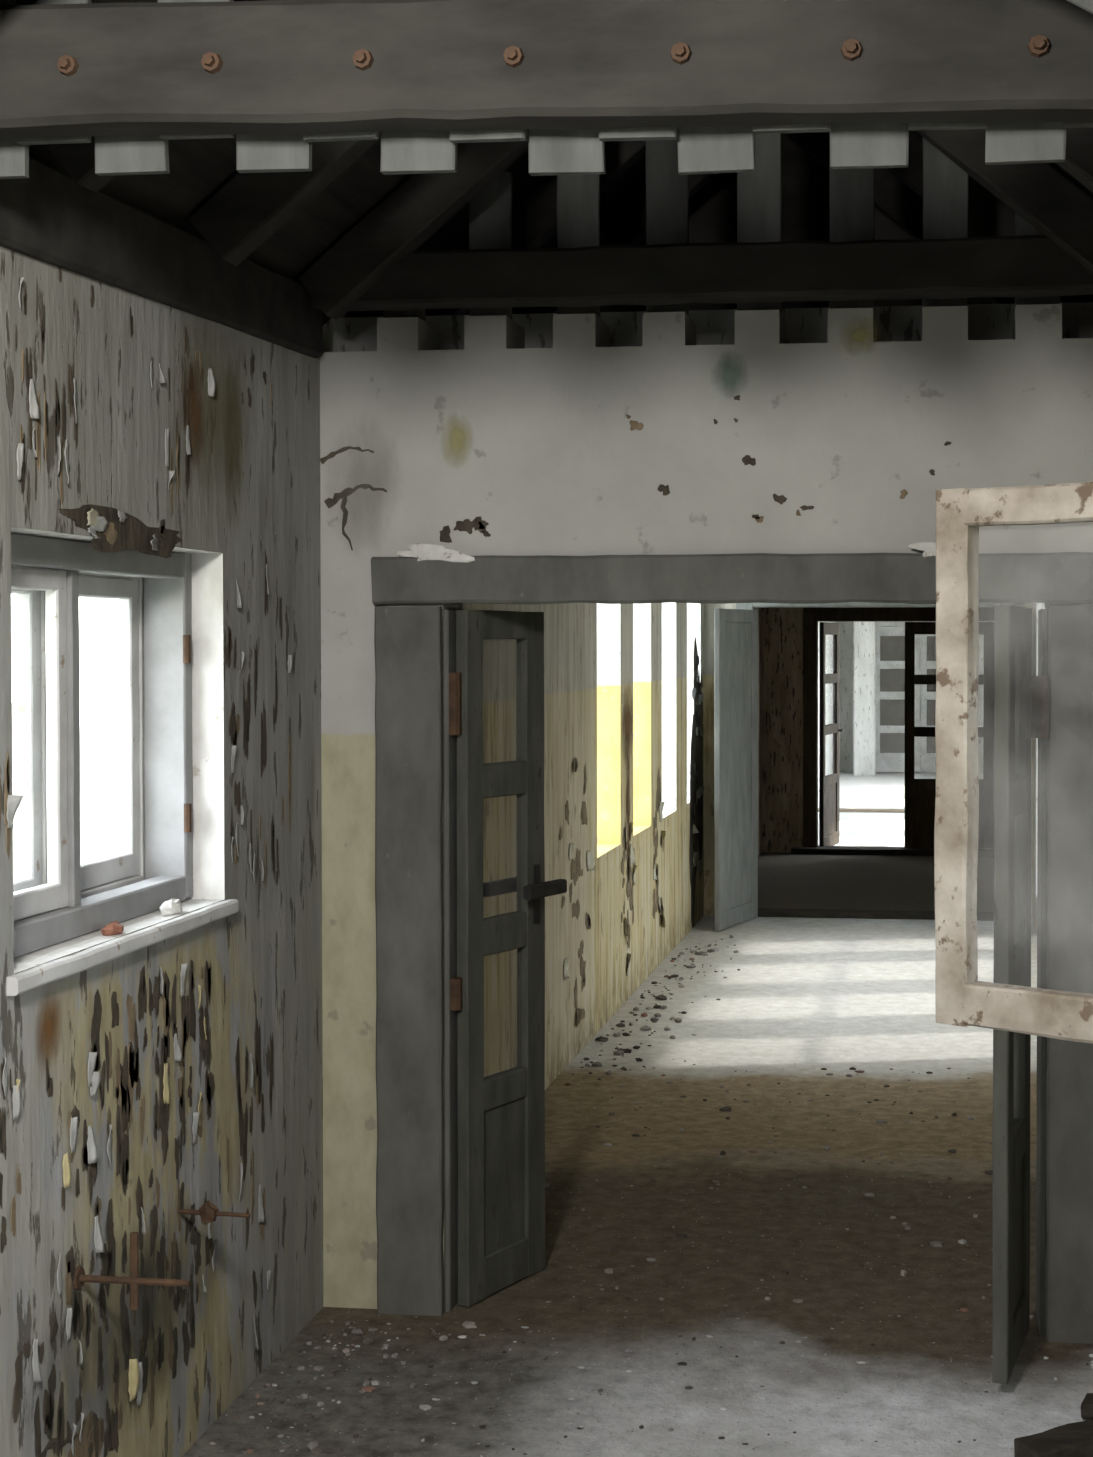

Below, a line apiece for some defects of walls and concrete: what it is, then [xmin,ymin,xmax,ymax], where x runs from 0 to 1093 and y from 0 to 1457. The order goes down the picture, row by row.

spalling [15,277,216,558]
crack [320,446,387,550]
peeling [0,751,23,859]
peeling [227,549,293,889]
peeling [0,1057,22,1253]
peeling [12,959,217,1457]
peeling [226,1018,274,1250]
peeling [252,1270,271,1350]